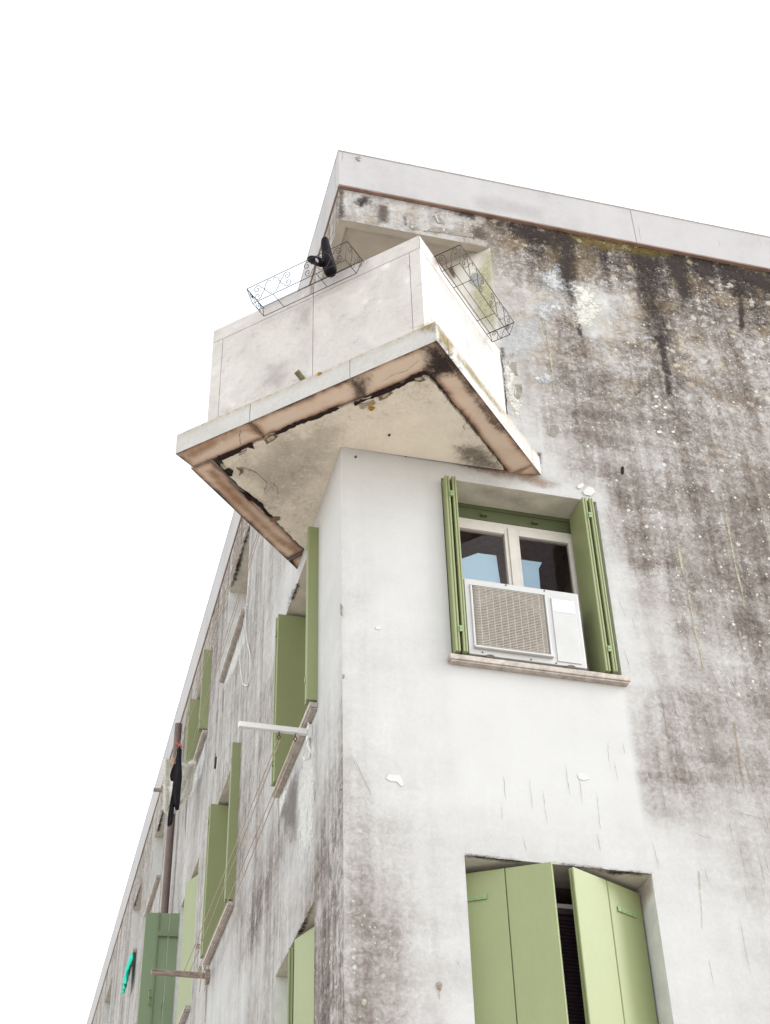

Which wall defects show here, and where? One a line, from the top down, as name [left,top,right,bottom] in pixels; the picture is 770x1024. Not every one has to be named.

water stain [357,196,389,222]
water stain [509,225,582,336]
water stain [627,246,770,394]
flaking render [353,371,426,410]
water stain [423,344,502,432]
flaking render [218,407,339,476]
flaking render [241,491,280,522]
water stain [278,775,297,833]